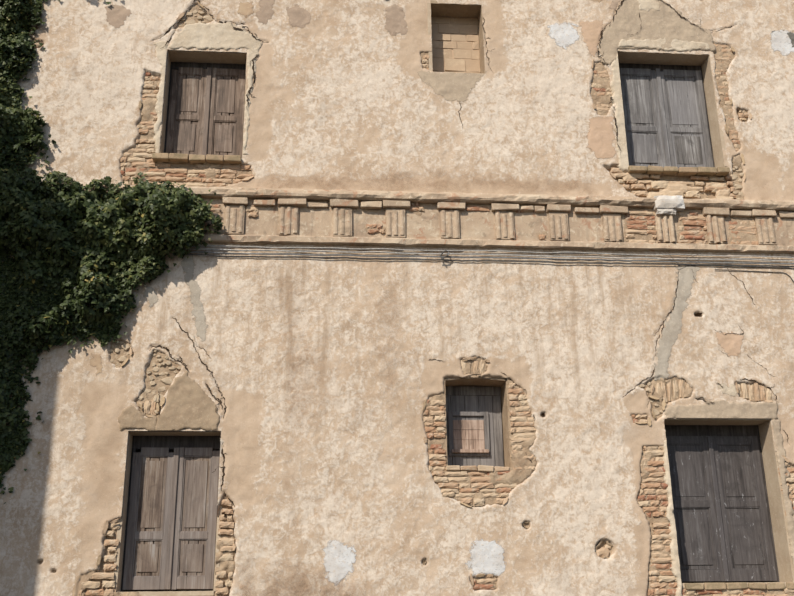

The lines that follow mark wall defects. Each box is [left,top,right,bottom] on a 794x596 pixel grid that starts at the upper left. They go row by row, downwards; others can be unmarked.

crack [153,0,262,109]
crack [598,0,624,66]
crack [661,0,734,33]
spalling [120,72,254,187]
spalling [607,44,752,200]
crack [149,317,227,418]
crack [623,271,697,405]
spalling [79,519,143,596]
crack [212,443,235,507]
spalling [214,495,236,596]
spalling [422,357,546,508]
spalling [637,446,794,596]